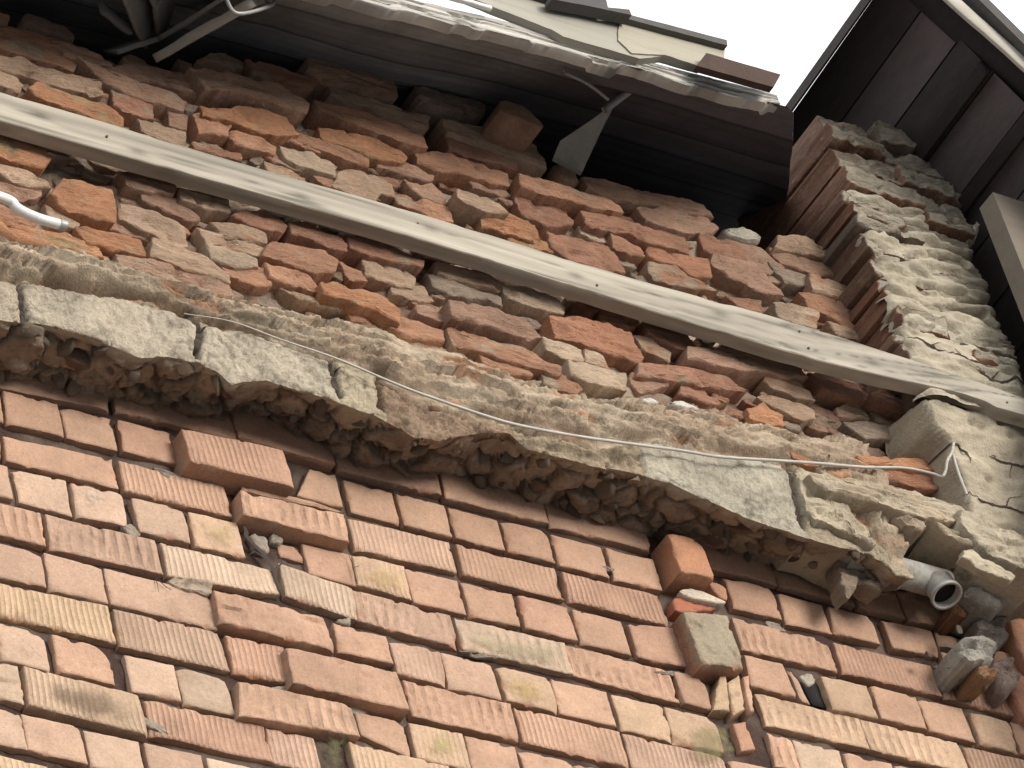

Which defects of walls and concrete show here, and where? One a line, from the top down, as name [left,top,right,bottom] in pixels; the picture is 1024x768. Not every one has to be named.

crack [907,337,1024,384]
spalling [0,320,1024,622]
crack [928,443,1024,471]
crack [957,491,1024,513]
spalling [797,673,827,709]